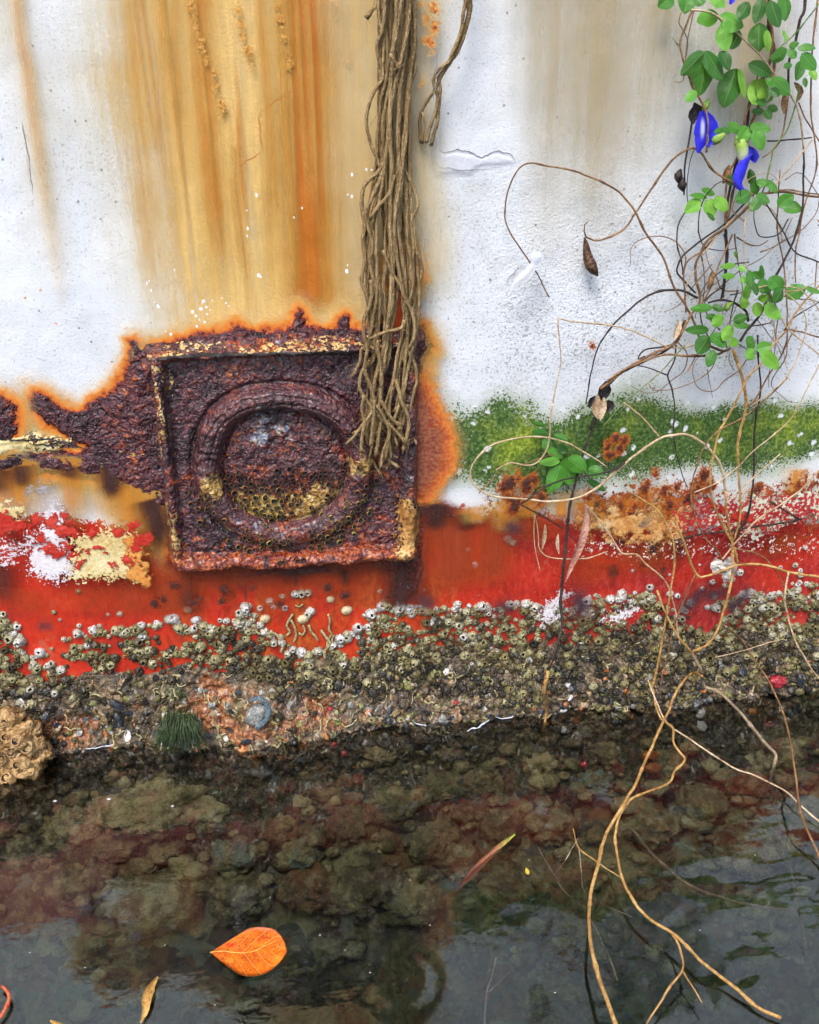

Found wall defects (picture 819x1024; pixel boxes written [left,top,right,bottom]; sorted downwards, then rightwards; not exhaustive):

corrosion [0,0,724,611]
peeling [0,478,155,589]
corrosion [737,469,819,514]